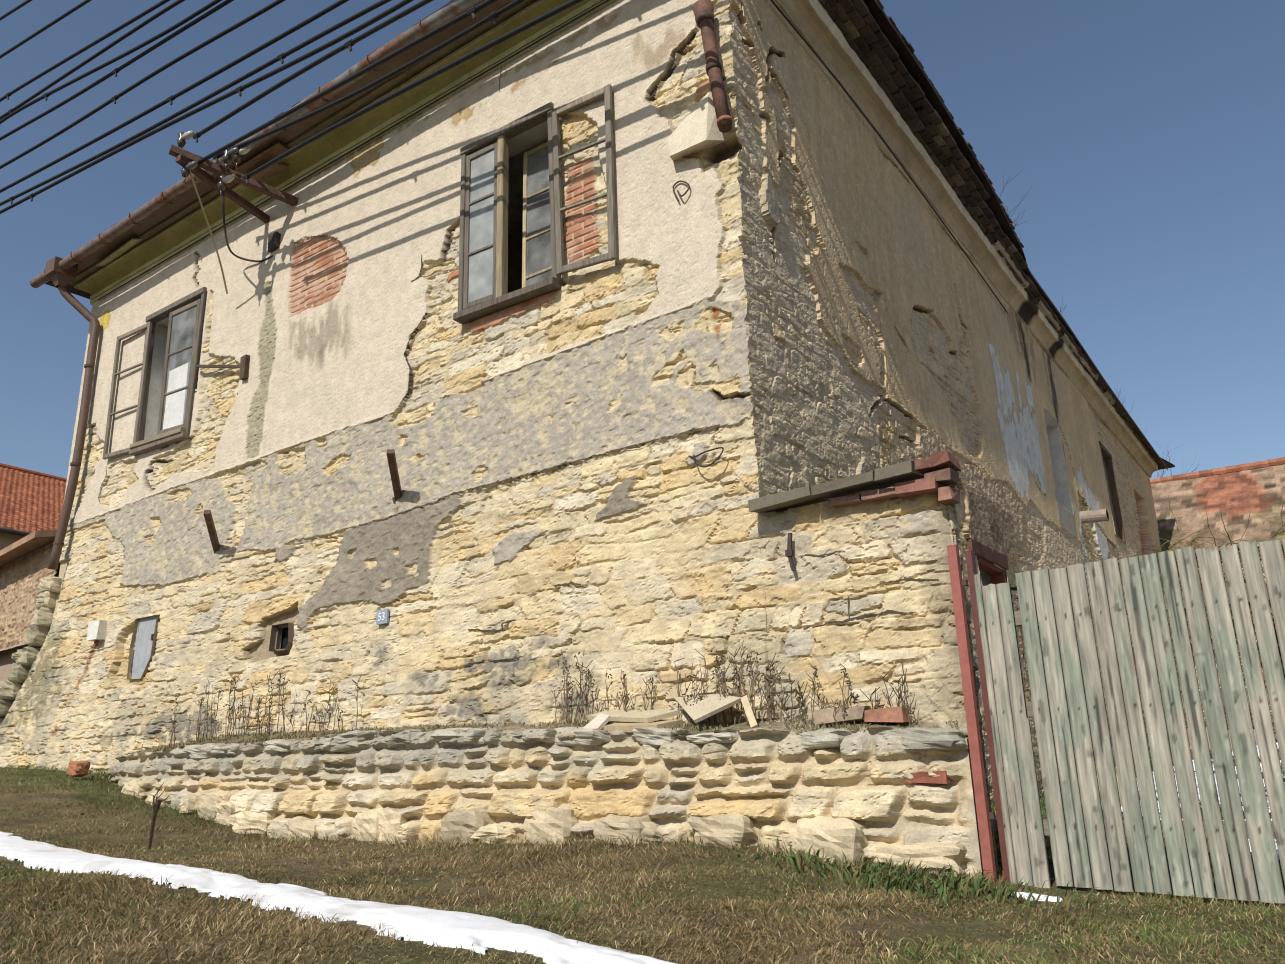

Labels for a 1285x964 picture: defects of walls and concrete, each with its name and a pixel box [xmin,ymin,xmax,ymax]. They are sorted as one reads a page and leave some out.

peeling [450,108,474,124]
spalling [651,0,747,396]
flaking render [762,172,780,224]
flaking render [291,234,349,316]
flaking render [391,112,660,460]
spalling [838,262,887,386]
spalling [910,284,983,458]
flaking render [70,289,351,553]
flaking render [472,464,489,482]
spalling [955,479,970,533]
flaking render [351,548,392,588]
flaking render [395,547,419,576]